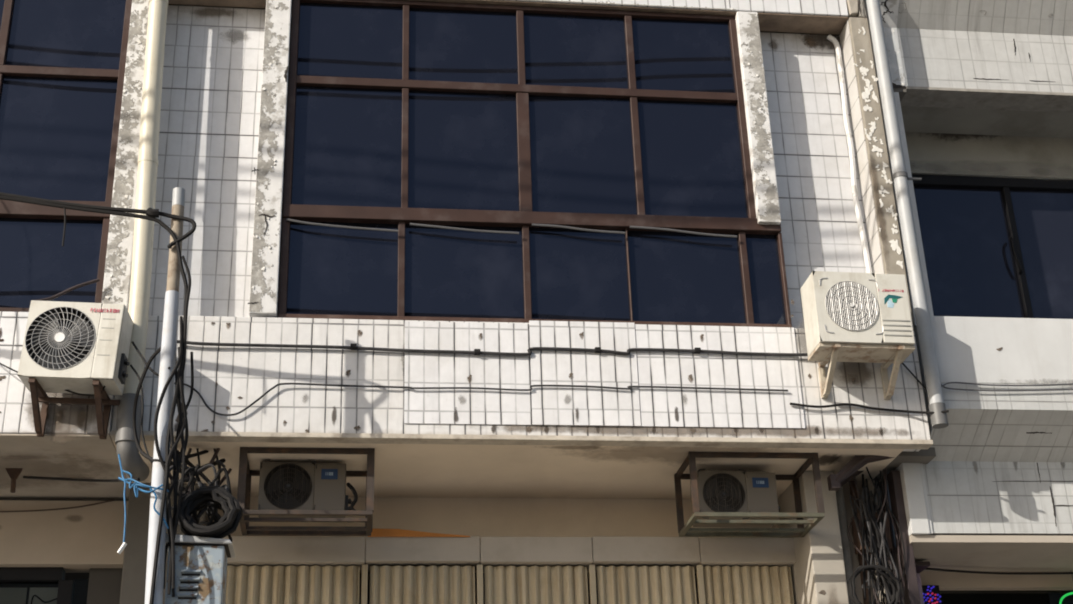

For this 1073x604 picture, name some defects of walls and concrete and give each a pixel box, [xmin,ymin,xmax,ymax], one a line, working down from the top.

peeling [102,0,149,304]
peeling [249,0,289,312]
spalling [536,0,736,10]
peeling [740,13,781,220]
spalling [846,0,867,35]
peeling [853,49,903,269]
crack [880,0,893,23]
peeling [884,28,907,88]